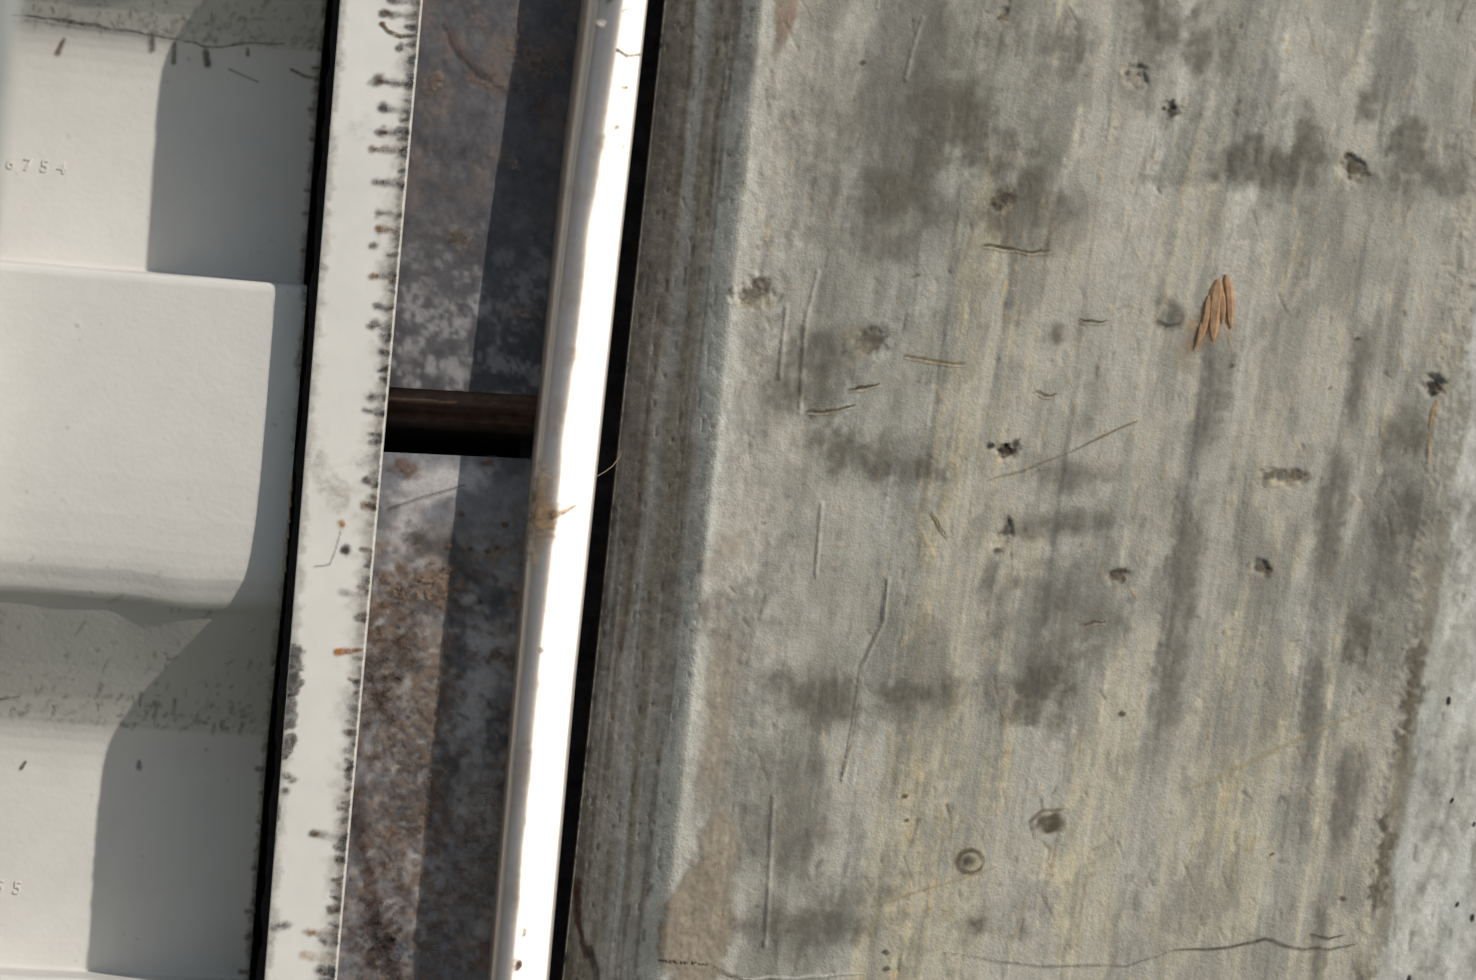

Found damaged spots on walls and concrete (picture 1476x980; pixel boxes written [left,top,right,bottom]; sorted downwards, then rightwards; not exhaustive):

damp [1214,119,1320,186]
damp [1348,346,1366,409]
rust [528,474,575,559]
damp [1318,461,1349,559]
damp [1160,525,1201,712]
damp [1396,644,1427,749]
rust [335,531,514,980]
damp [1371,815,1397,902]
crack [1183,934,1353,950]